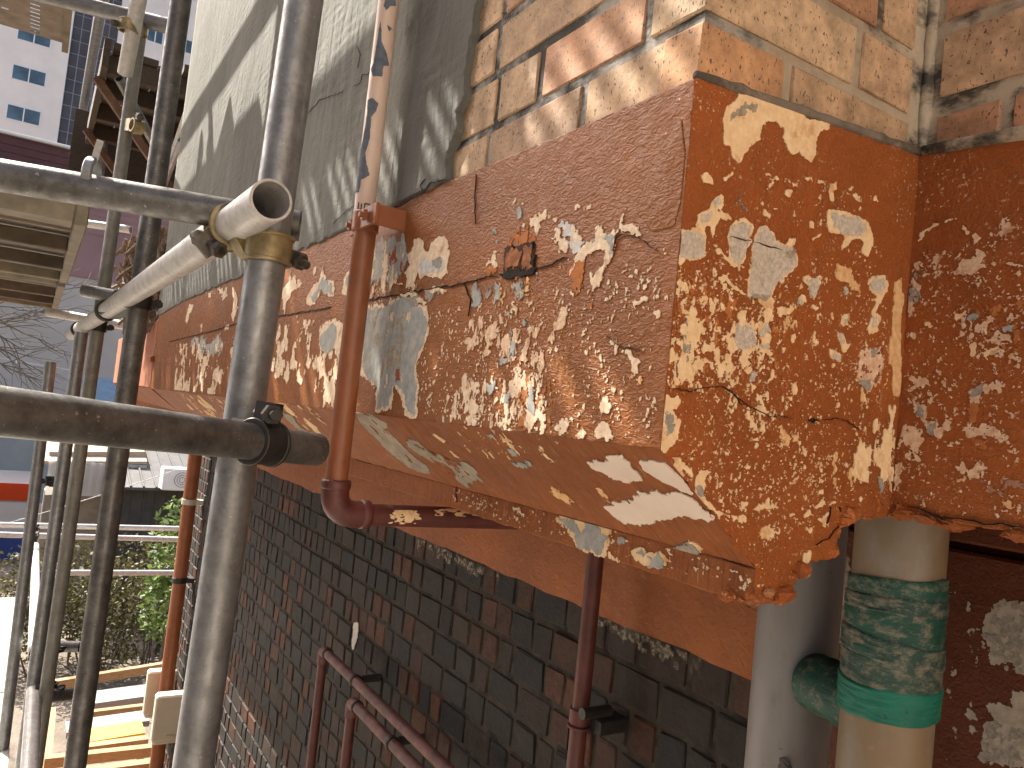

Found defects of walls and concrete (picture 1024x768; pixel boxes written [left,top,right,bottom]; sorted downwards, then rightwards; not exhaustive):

peeling [370,22,392,77]
crack [394,175,477,224]
crack [612,233,654,250]
crack [279,306,331,316]
crack [369,257,566,317]
peeling [174,287,239,417]
peeling [271,266,349,440]
peeling [356,93,1024,643]
crack [670,386,792,419]
crack [909,506,1023,527]
peeling [967,599,1024,675]
peeling [952,688,1024,768]